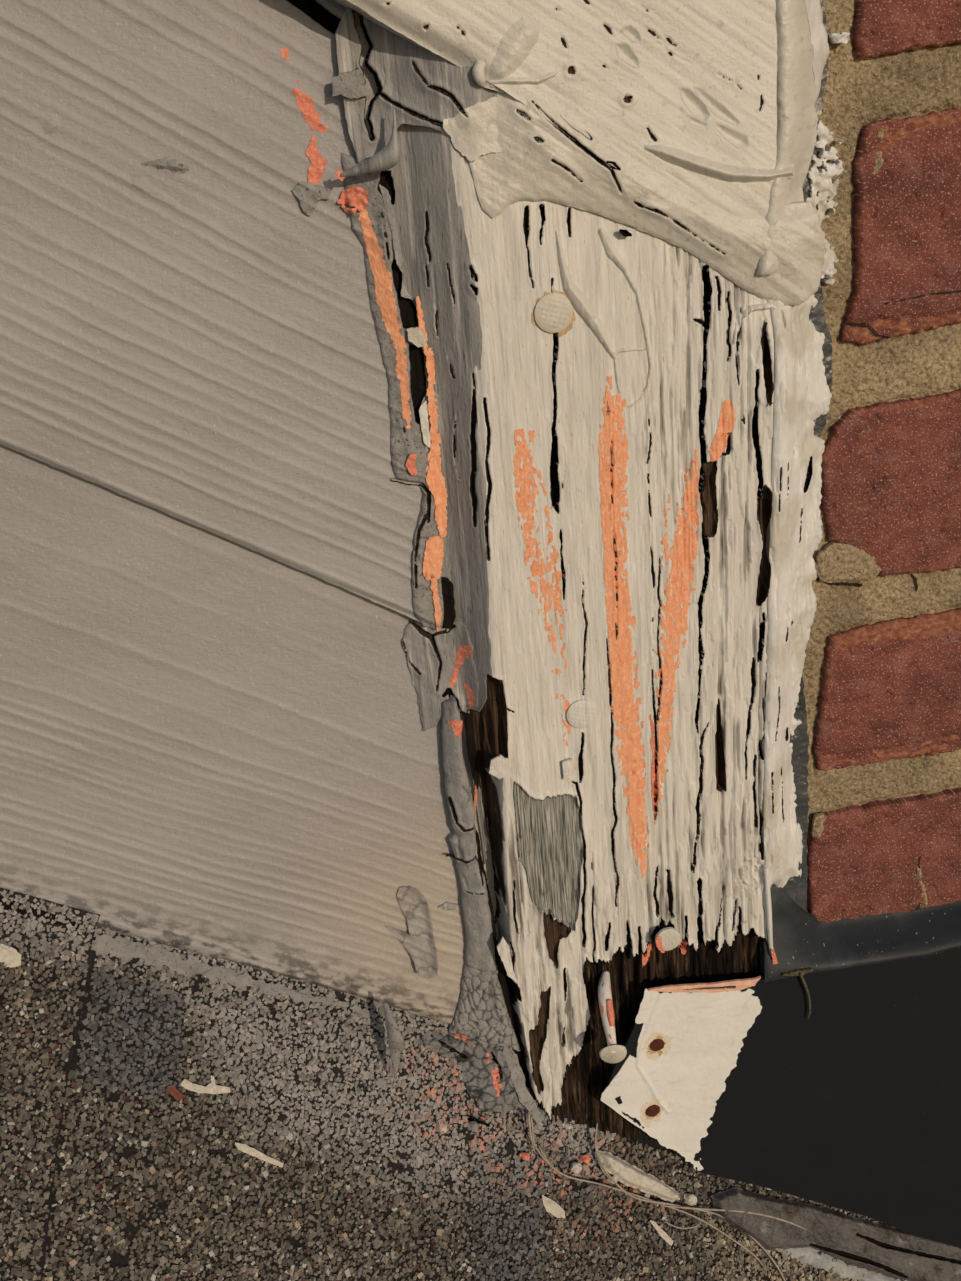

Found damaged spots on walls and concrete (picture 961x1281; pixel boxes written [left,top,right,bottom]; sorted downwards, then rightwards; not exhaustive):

crack [555,0,613,48]
crack [646,10,676,56]
peeling [407,327,426,347]
peeling [419,400,431,447]
crack [391,478,462,713]
crack [517,100,812,1047]
crack [446,796,519,968]
peeling [489,754,583,969]
peeling [497,937,518,983]
peeling [529,987,551,1096]
corrosion [642,1031,671,1061]
corrosion [640,1097,665,1128]